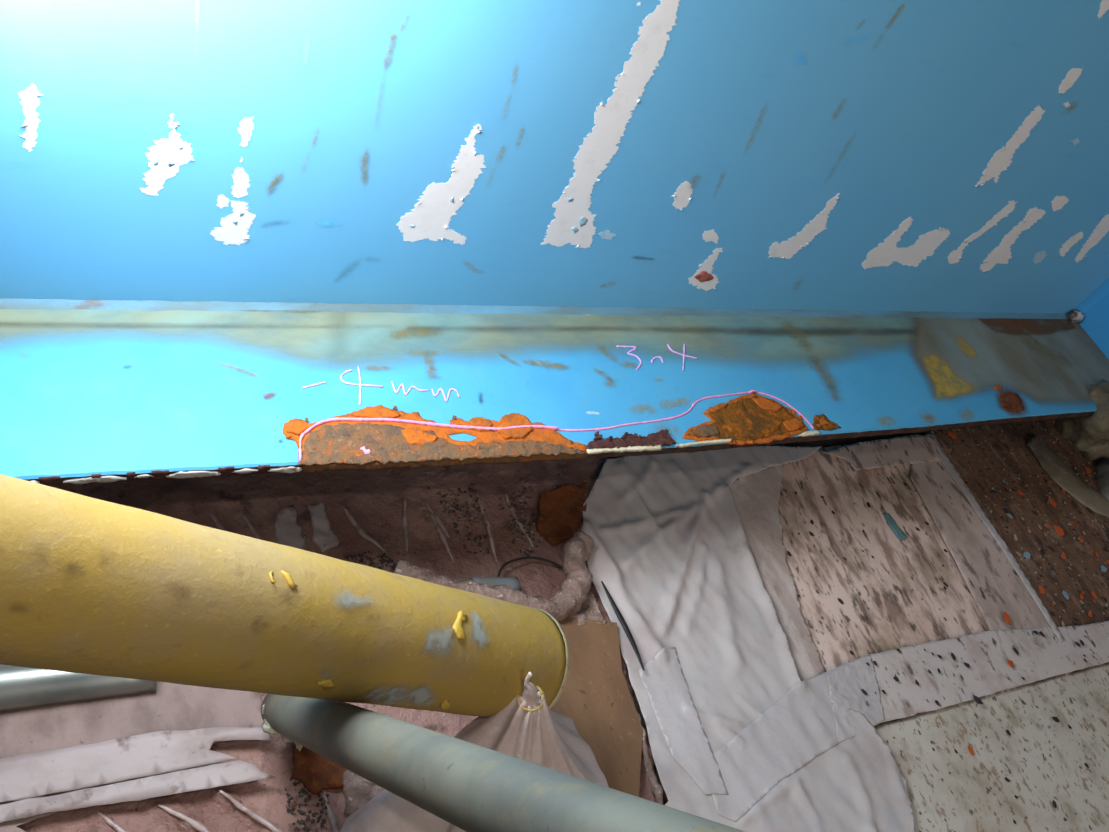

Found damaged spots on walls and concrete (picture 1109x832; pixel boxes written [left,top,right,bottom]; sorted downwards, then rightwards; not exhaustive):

peeling [140,114,195,196]
peeling [210,117,256,245]
peeling [396,124,486,245]
peeling [541,0,680,248]
peeling [768,193,840,259]
peeling [861,196,1069,273]
water stain [0,309,1109,403]
rust [39,476,61,485]
rust [151,470,169,480]
rust [218,466,234,476]
rust [283,392,842,472]
rust [994,385,1025,414]